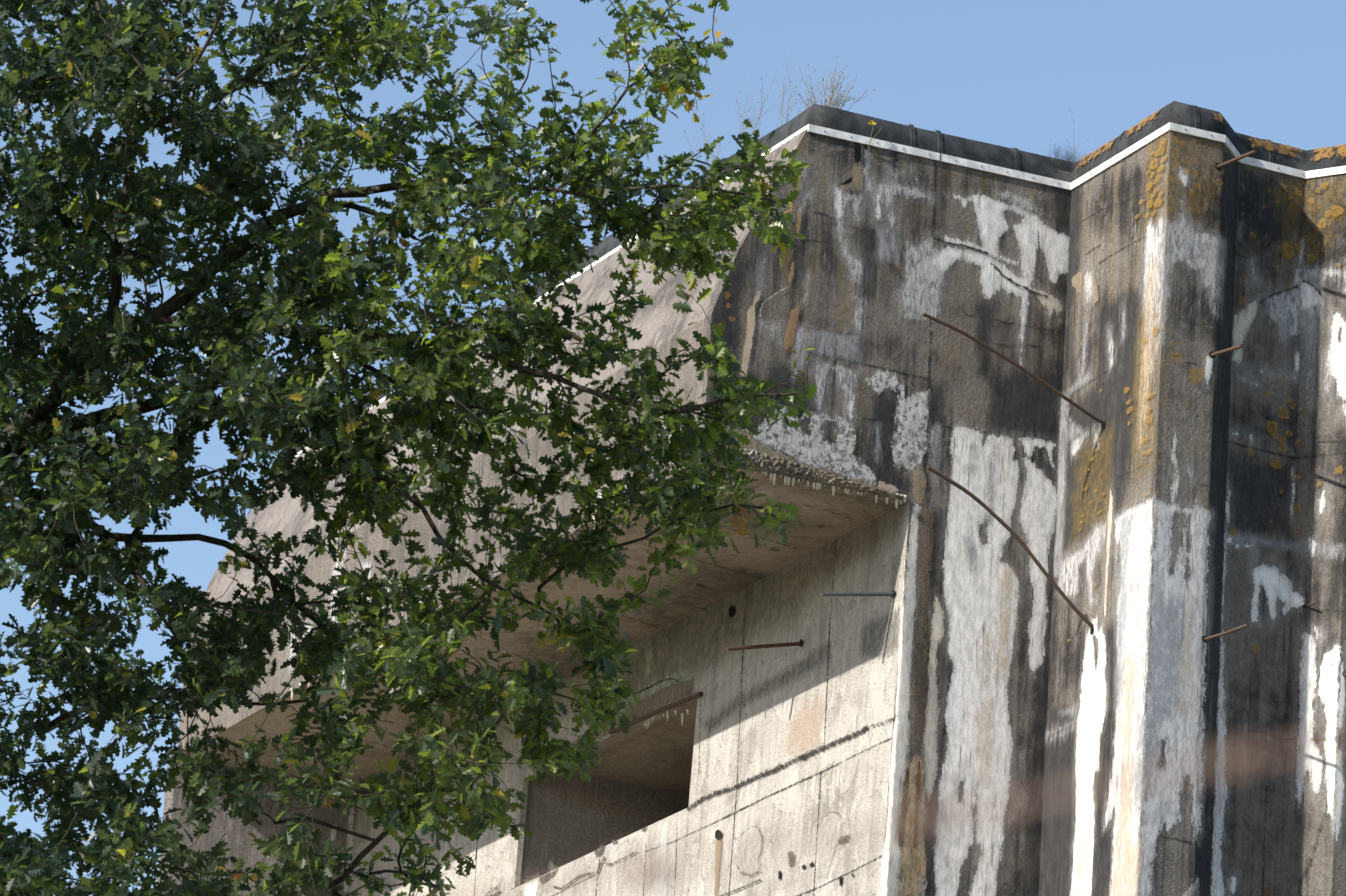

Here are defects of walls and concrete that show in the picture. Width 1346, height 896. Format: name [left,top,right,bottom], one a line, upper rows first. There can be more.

spalling [725,424,934,756]
leakage [707,149,1346,896]
corrosion [898,757,927,896]